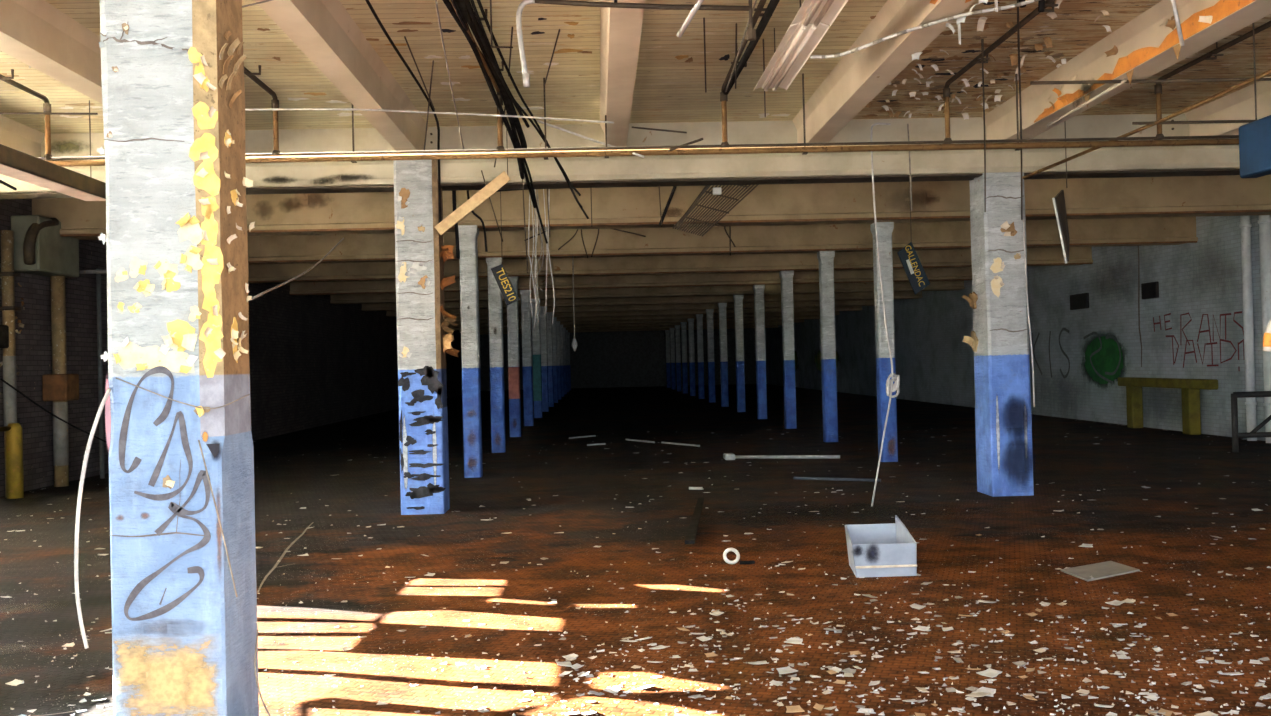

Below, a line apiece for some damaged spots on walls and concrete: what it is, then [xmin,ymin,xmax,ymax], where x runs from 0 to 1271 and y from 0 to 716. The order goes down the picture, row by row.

crack [99,22,189,53]
peeling [862,0,1066,120]
peeling [1034,0,1255,123]
peeling [100,30,255,378]
peeling [1000,221,1017,236]
spalling [962,292,978,309]
peeling [990,253,1021,297]
spalling [962,331,979,352]
peeling [398,346,446,510]
water stain [1004,398,1033,484]
peeling [115,641,216,716]